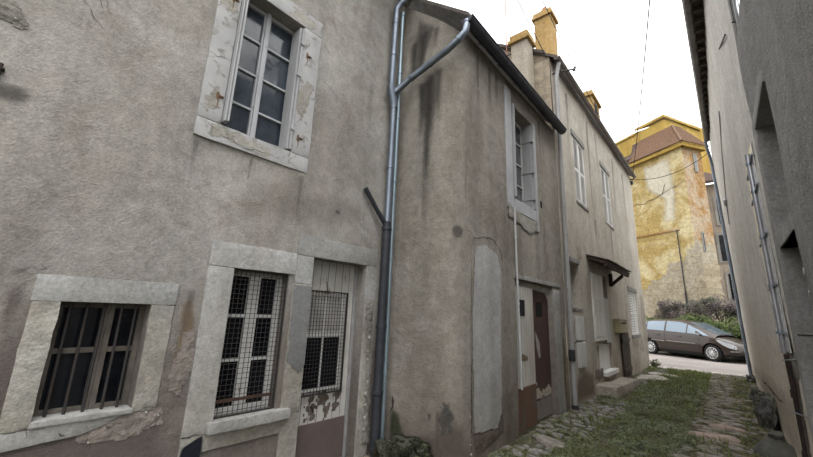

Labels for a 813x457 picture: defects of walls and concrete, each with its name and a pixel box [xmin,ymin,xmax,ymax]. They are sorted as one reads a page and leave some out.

flaking render [0,0,29,30]
flaking render [167,303,195,395]
peeling [303,389,342,423]
peeling [536,382,552,401]
flaking render [75,407,164,444]